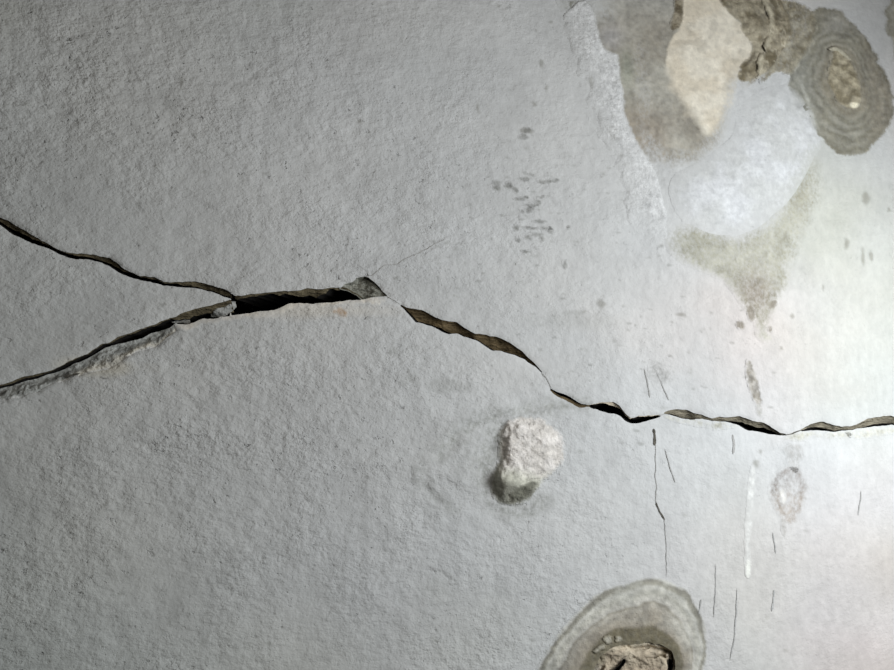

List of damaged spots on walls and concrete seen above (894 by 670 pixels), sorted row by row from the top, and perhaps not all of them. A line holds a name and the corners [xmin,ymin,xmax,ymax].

peeling [562,0,818,239]
damp [665,0,894,344]
crack [0,218,894,578]